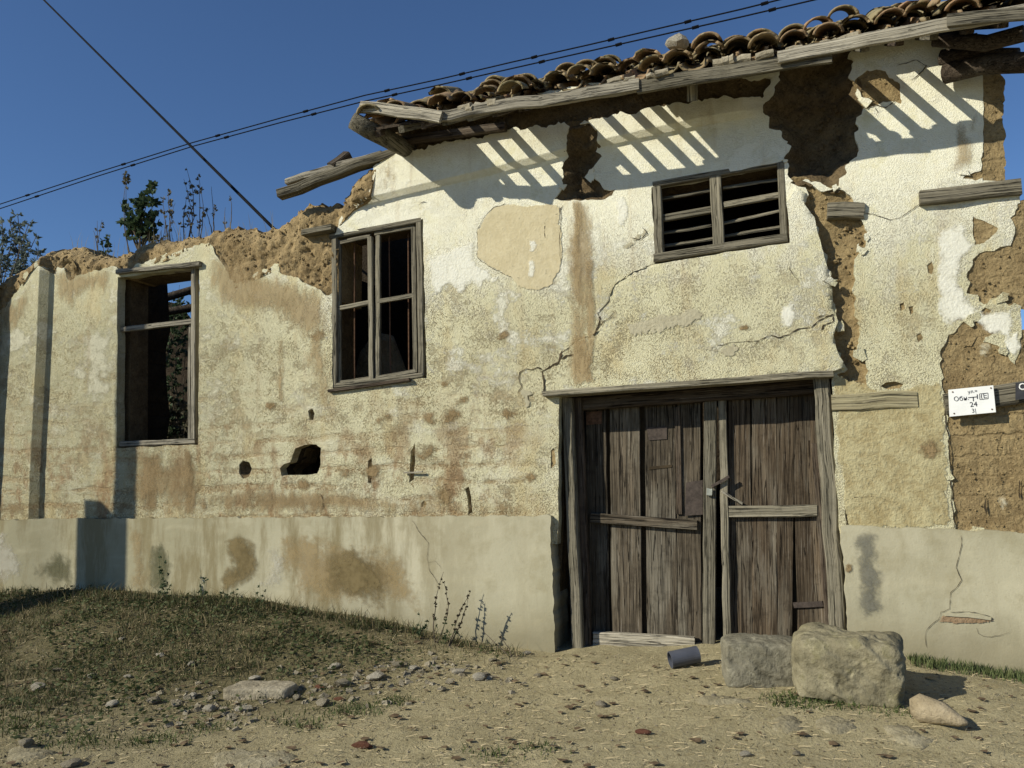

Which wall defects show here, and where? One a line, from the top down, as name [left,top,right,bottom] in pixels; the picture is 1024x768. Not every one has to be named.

water stain [572,202,594,383]
crack [518,263,656,392]
peeling [396,50,1024,533]
spalling [286,445,321,490]
water stain [222,537,257,590]
water stain [272,539,407,603]
water stain [856,536,880,614]
crack [925,411,1009,647]
spalling [939,613,993,624]